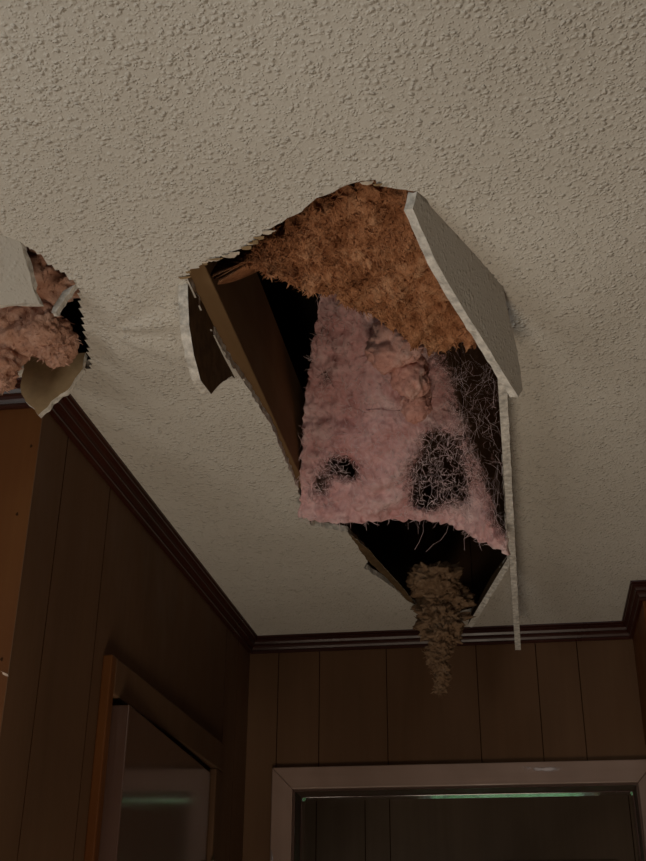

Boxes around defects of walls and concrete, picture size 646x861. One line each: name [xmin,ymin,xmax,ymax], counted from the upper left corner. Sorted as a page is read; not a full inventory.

spalling [51,284,78,316]